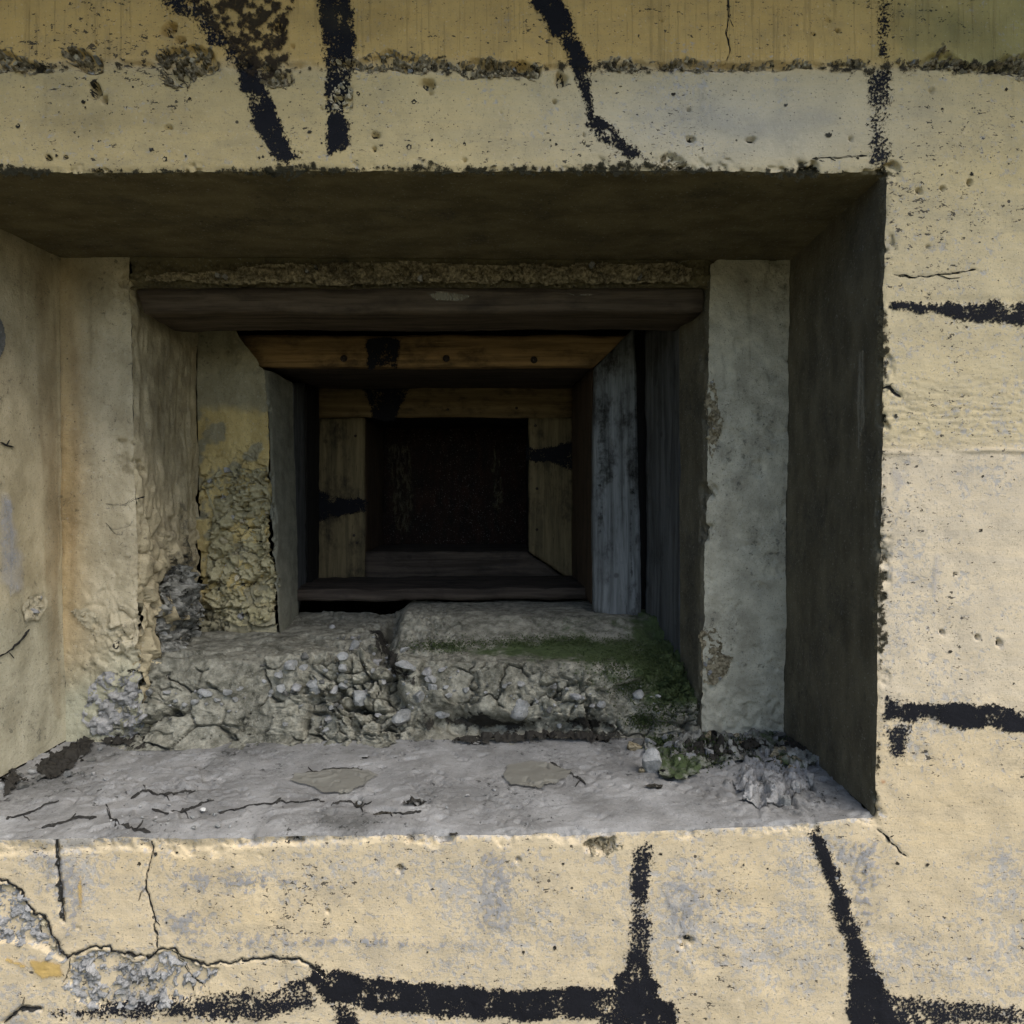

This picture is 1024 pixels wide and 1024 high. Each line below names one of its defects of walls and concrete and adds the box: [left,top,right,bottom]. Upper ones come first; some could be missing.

crack [725,0,734,65]
crack [894,269,976,279]
peeling [143,465,281,659]
spalling [71,608,127,637]
spalling [81,664,151,740]
crack [0,785,421,991]
spalling [0,850,445,1010]